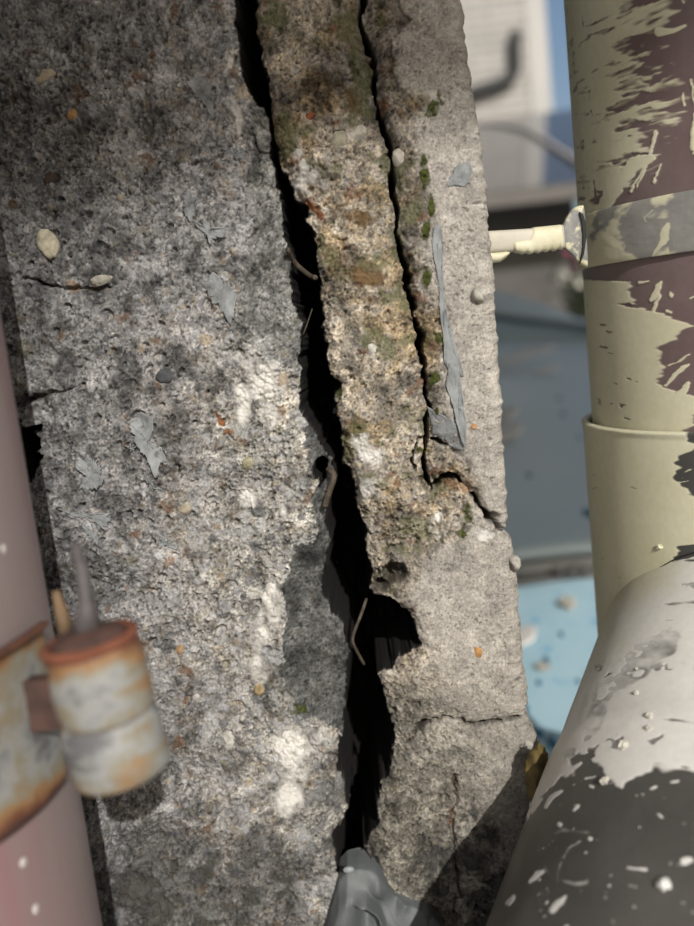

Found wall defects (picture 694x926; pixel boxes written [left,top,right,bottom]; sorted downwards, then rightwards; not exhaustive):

efflorescence [293,149,325,195]
damp [344,202,375,226]
damp [350,267,383,285]
efflorescence [235,351,286,430]
crack [194,0,525,873]
efflorescence [351,433,384,467]
damp [239,484,261,508]
efflorescence [360,480,375,497]
efflorescence [472,529,493,542]
crack [450,773,463,926]